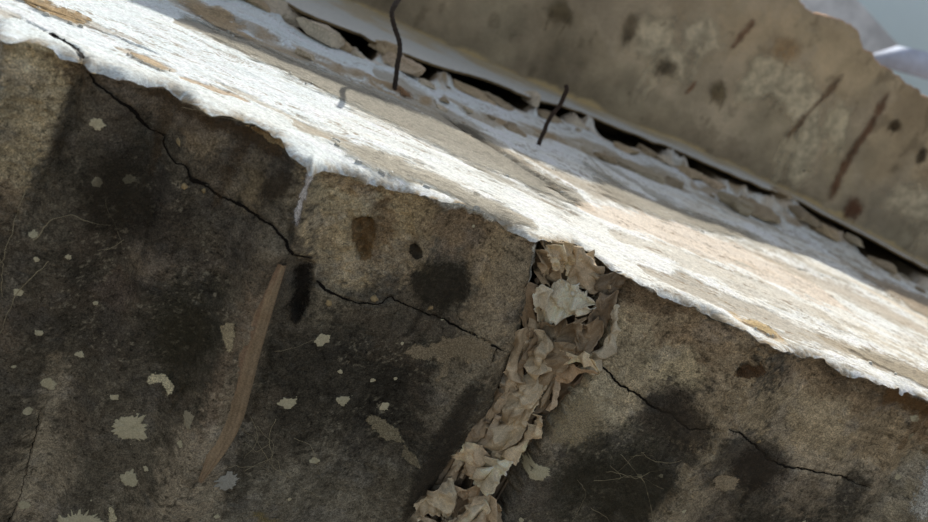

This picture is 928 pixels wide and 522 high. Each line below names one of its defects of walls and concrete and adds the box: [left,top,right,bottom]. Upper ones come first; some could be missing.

spalling [24,0,92,28]
peeling [177,0,585,206]
crack [33,8,313,259]
peeling [330,138,538,226]
leakage [405,256,473,311]
crack [316,280,504,363]
crack [597,366,664,413]
leakage [647,393,719,453]
peeling [844,344,928,387]
leakage [883,389,928,414]
leakage [554,449,681,522]
crack [729,429,870,488]